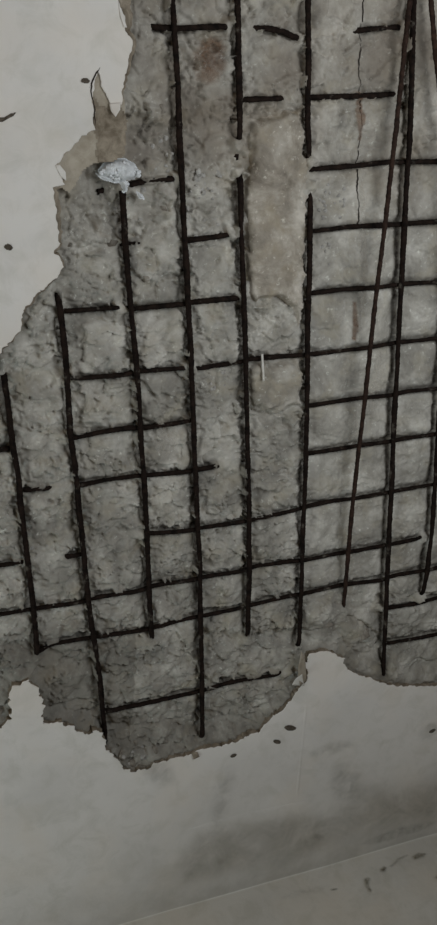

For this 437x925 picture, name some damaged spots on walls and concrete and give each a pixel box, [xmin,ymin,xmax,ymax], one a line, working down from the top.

spalling [55,0,437,738]